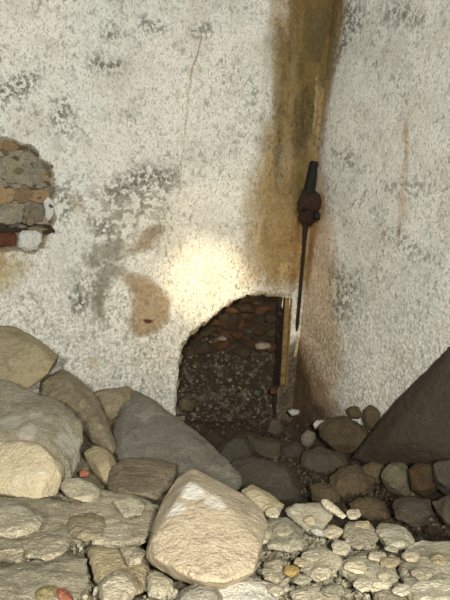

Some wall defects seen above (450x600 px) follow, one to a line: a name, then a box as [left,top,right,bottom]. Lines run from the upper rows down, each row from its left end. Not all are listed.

flaking render [0,136,58,254]
leakage [74,170,173,316]
leakage [126,274,169,336]
leakage [250,0,361,288]